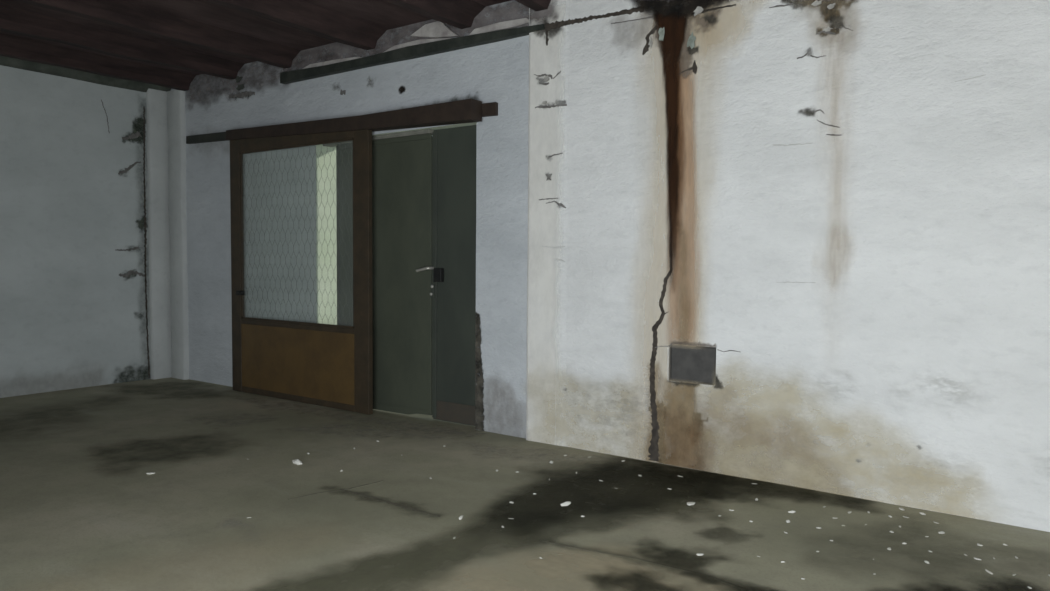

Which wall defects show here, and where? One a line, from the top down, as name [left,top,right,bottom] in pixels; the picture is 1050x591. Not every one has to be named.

spalling [642,23,665,55]
spalling [678,5,740,78]
spalling [769,0,854,36]
spalling [229,76,255,99]
corrosion [655,14,695,344]
crack [647,214,673,462]
corrosion [660,382,699,469]
damp [257,382,972,591]